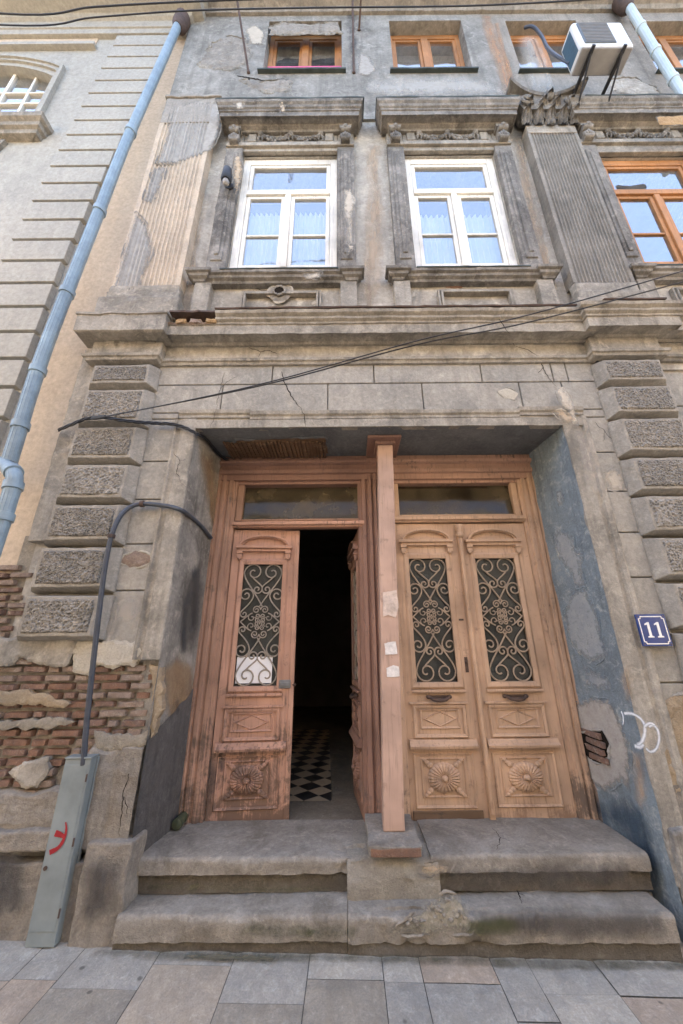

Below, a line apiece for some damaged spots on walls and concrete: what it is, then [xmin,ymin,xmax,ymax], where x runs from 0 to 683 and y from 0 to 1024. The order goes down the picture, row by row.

flaking render [115,101,222,292]
crack [254,349,306,426]
flaking render [0,550,167,793]
peeling [552,531,633,792]
crack [118,774,129,833]
spalling [395,889,475,939]